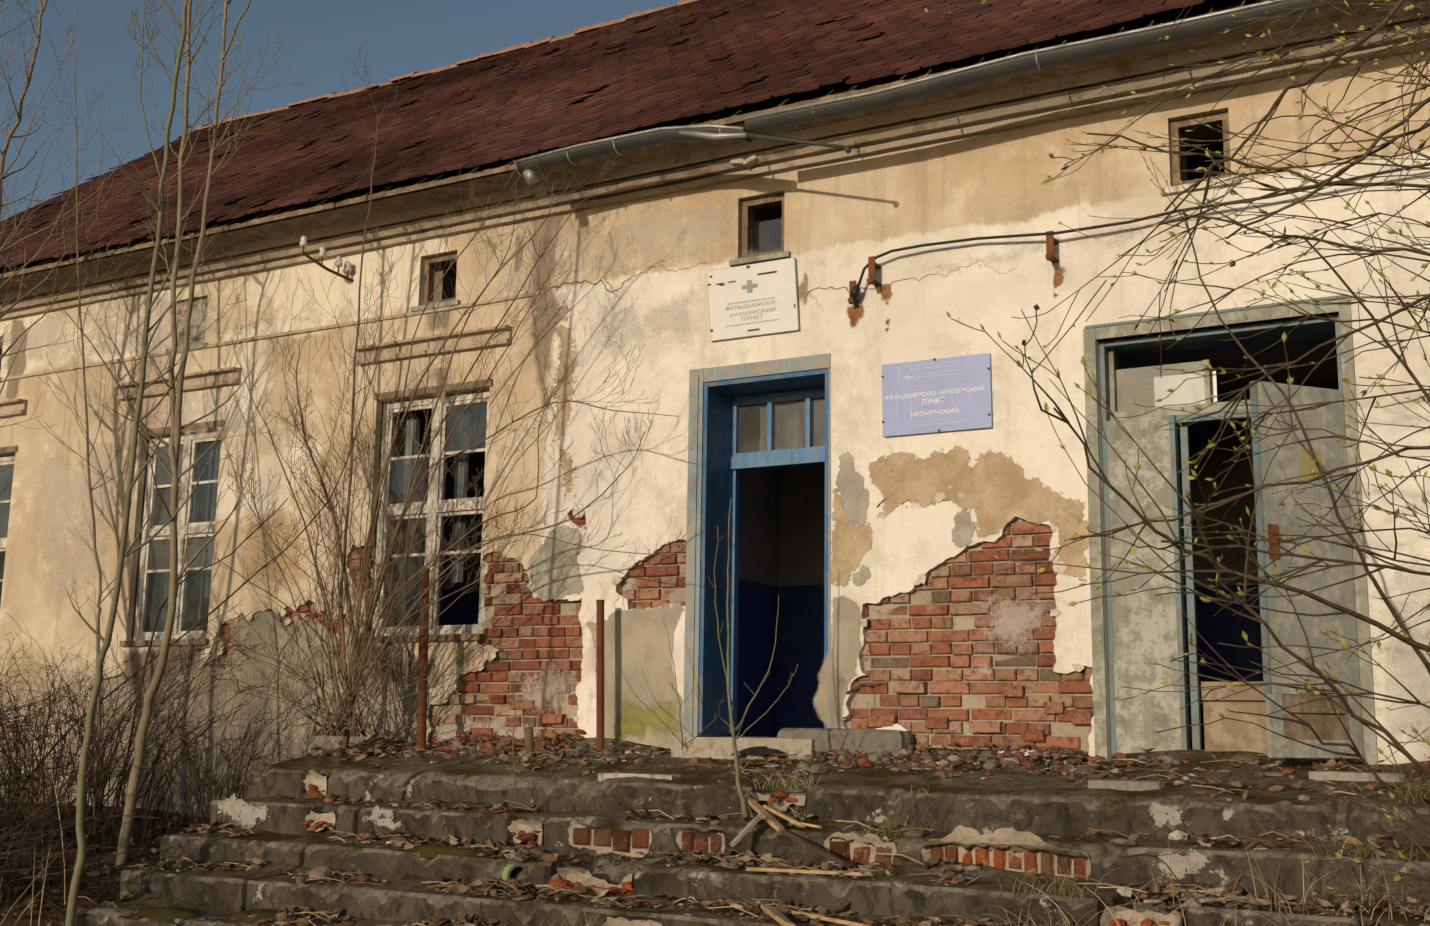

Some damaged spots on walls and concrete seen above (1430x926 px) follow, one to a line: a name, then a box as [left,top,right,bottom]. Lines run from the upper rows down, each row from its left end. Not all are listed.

corrosion [1053,268,1064,297]
corrosion [847,304,864,327]
corrosion [881,285,892,331]
spalling [611,542,686,609]
spalling [826,445,1094,757]
spalling [92,552,583,832]
spalling [676,830,725,853]
spalling [823,832,897,867]
spalling [921,825,1091,880]